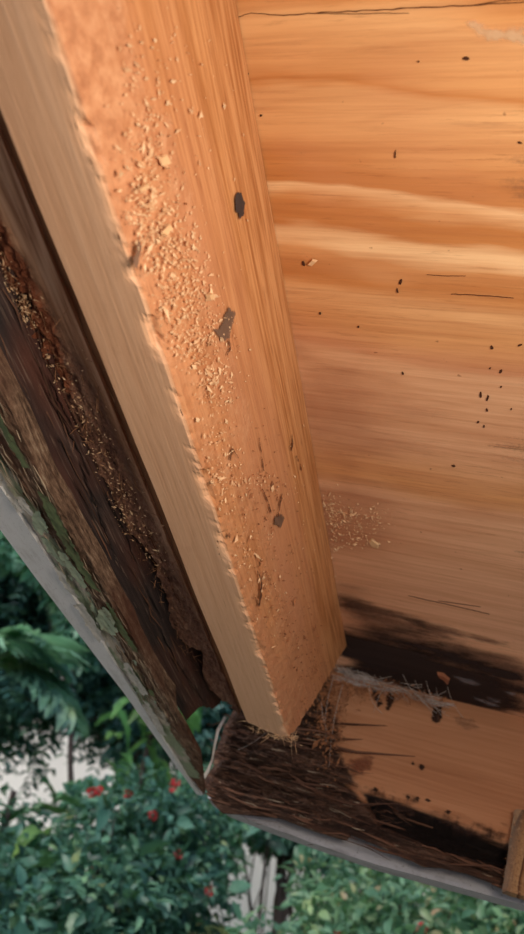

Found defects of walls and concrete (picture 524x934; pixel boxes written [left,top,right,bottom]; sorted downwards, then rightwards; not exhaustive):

crack [239,0,524,17]
peeling [0,473,166,736]
leakage [340,598,524,723]